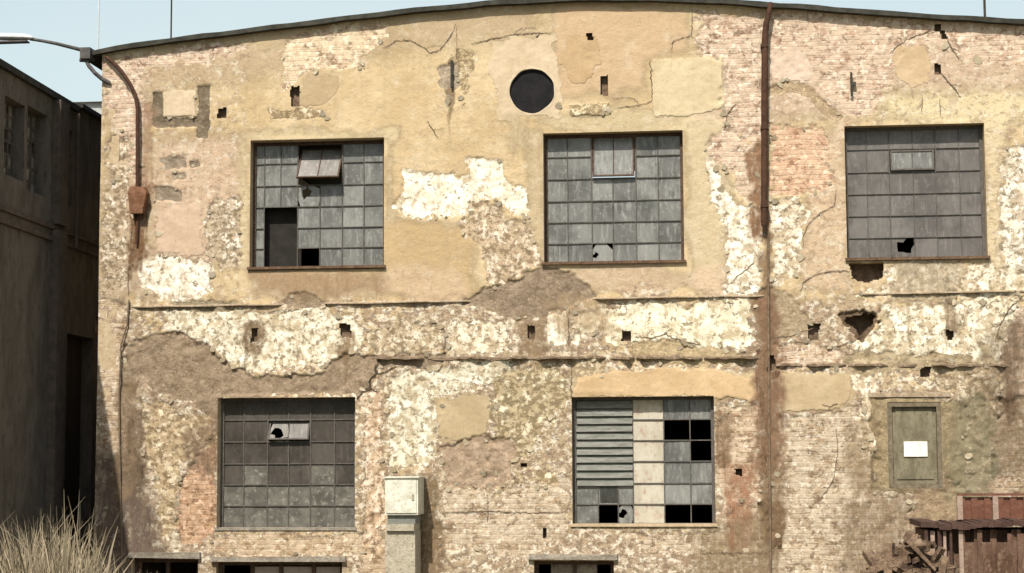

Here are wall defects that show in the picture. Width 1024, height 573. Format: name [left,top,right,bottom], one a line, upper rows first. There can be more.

rust [128,184,151,271]
flaking render [95,42,609,573]
crack [384,24,544,56]
flaking render [391,7,1024,573]
leakage [698,233,785,573]
crack [891,29,961,116]